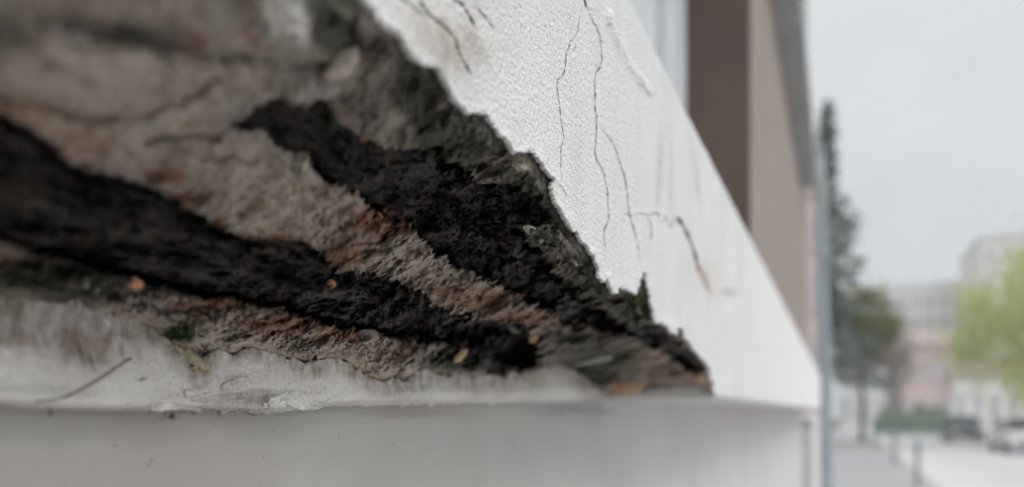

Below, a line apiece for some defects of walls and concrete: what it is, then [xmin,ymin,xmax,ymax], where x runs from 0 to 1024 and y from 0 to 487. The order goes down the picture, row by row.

crack [403,0,493,72]
crack [557,0,700,272]
spalling [0,0,712,396]
leakage [160,335,212,374]
peeling [150,377,251,412]
peeling [262,391,330,410]